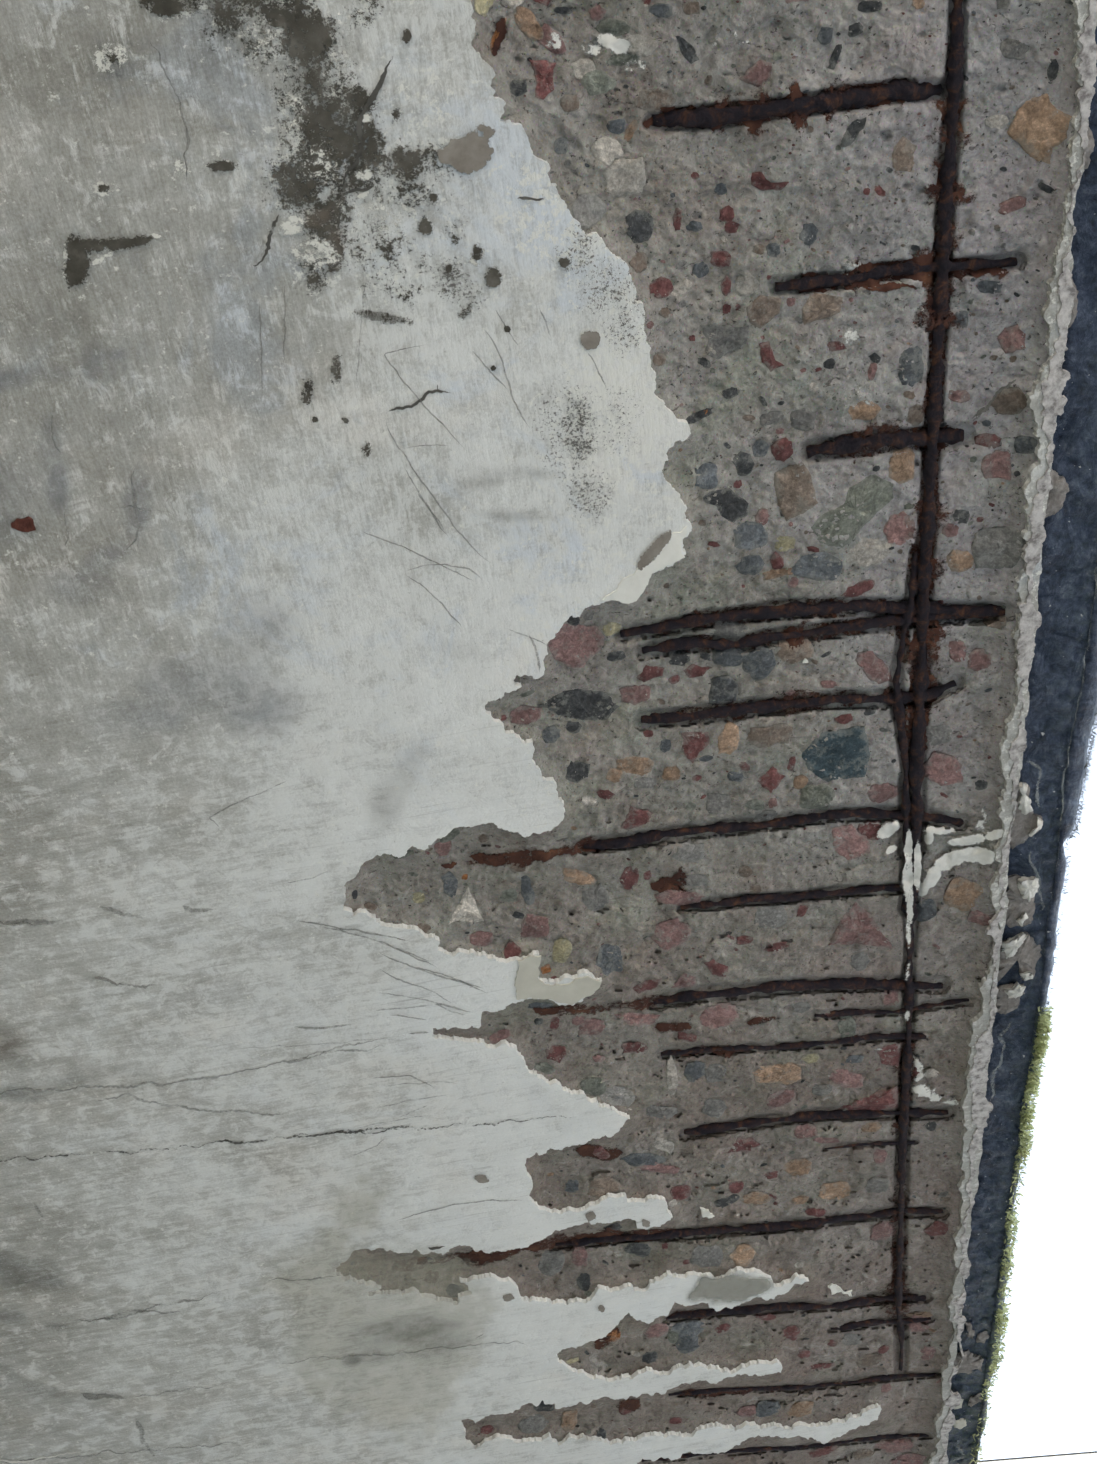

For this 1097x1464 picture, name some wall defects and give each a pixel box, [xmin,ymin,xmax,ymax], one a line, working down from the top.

damp [140,0,503,325]
damp [61,233,161,291]
damp [555,225,657,358]
damp [301,355,342,422]
corrosion [643,43,1009,760]
spalling [336,0,1079,1464]
damp [877,63,1097,1464]
corrosion [441,836,607,869]
corrosion [533,995,737,1058]
crack [0,1043,555,1162]
corrosion [417,1226,676,1267]
corrosion [594,1327,620,1350]